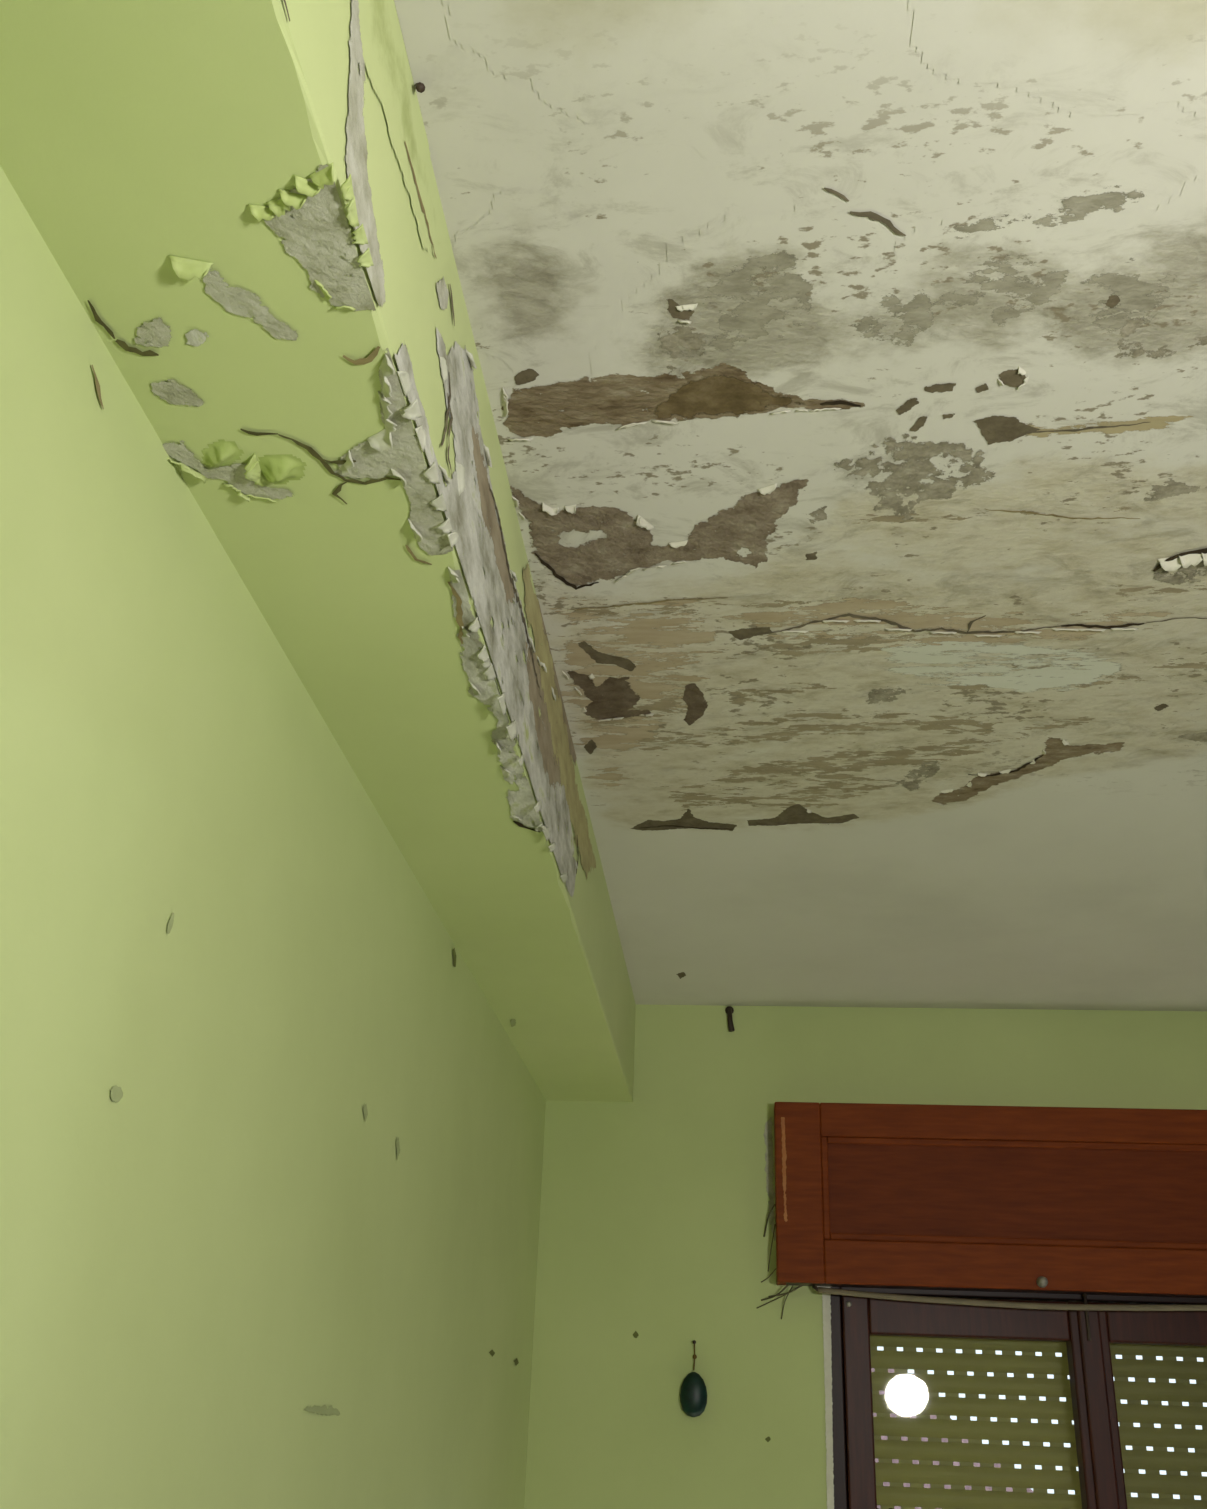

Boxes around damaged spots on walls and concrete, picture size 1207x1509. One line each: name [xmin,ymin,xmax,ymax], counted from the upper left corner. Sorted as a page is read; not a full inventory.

peeling [248,0,386,311]
damp [358,0,1207,402]
peeling [168,255,298,340]
peeling [502,299,865,442]
peeling [976,367,1029,393]
peeling [163,440,294,503]
peeling [834,383,1039,521]
peeling [1144,479,1207,501]
peeling [334,327,859,897]
crack [754,613,1207,637]
peeling [866,688,910,705]
peeling [896,737,1125,807]